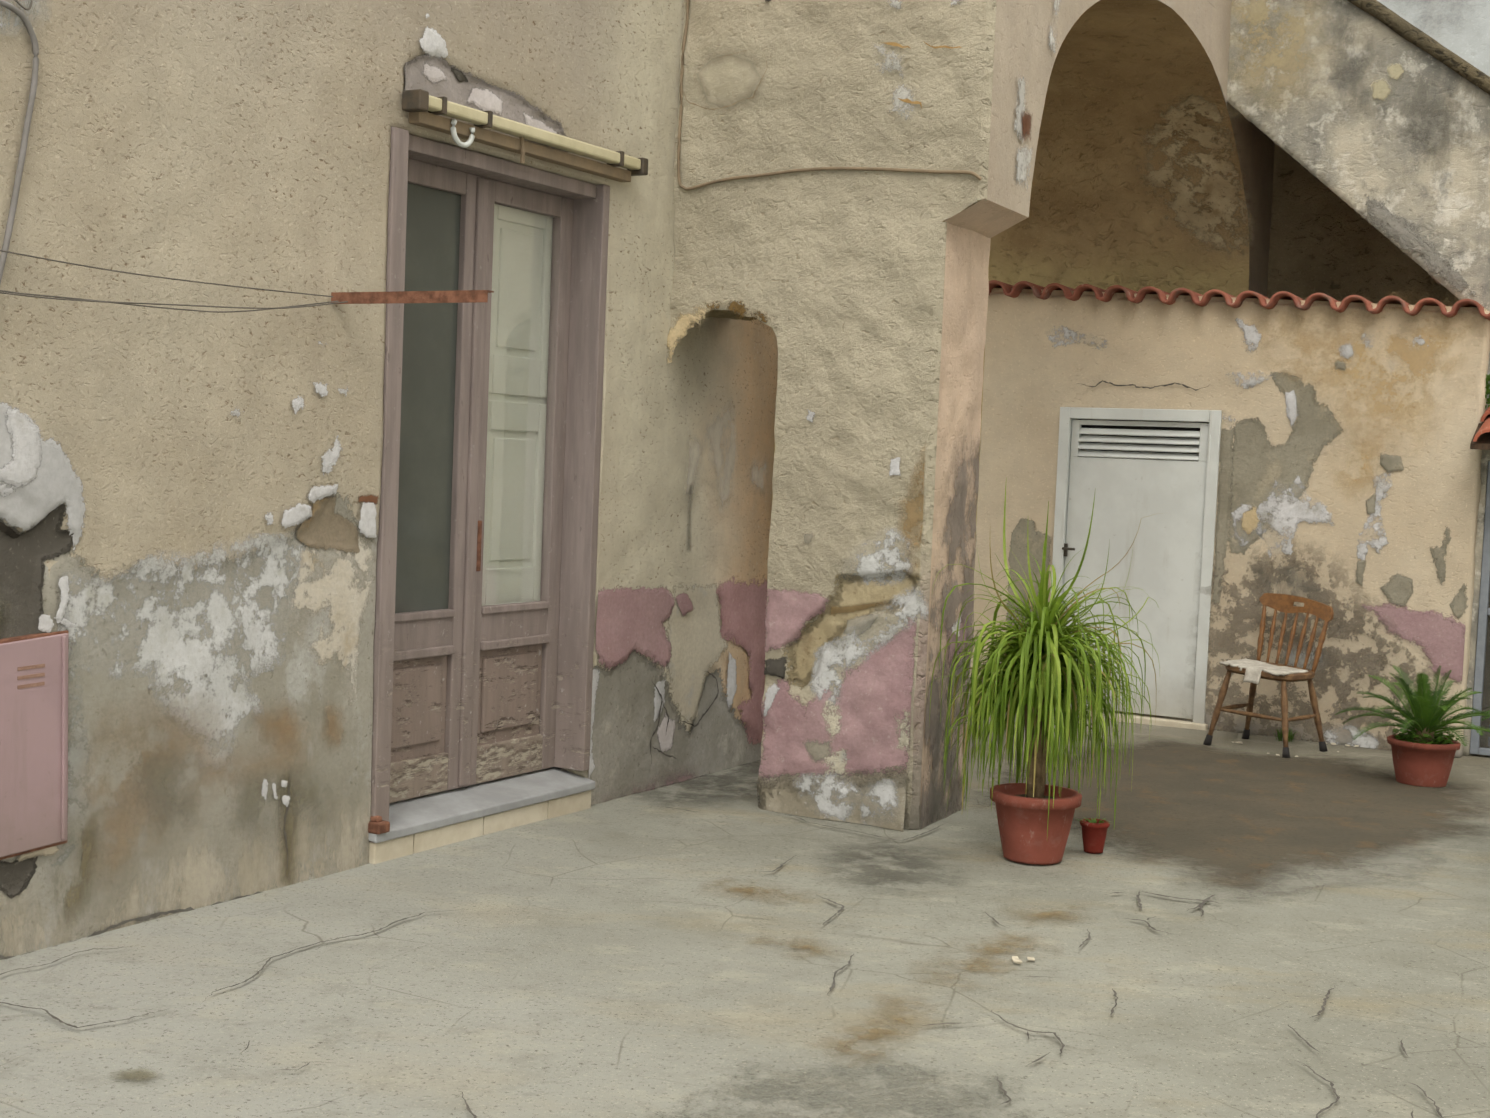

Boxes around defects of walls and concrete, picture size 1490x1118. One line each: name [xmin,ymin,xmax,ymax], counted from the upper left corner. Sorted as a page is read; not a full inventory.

water stain [65,830,95,912]
crack [0,766,291,1028]
flaking render [0,402,378,959]
water stain [245,776,316,882]
crack [203,909,471,1002]
flaking render [667,300,771,363]
flaking render [588,457,928,831]
crack [1077,380,1208,391]
water stain [1045,553,1490,889]
flaking render [1211,370,1343,603]
crack [1288,985,1340,1118]
peeling [1355,453,1468,683]